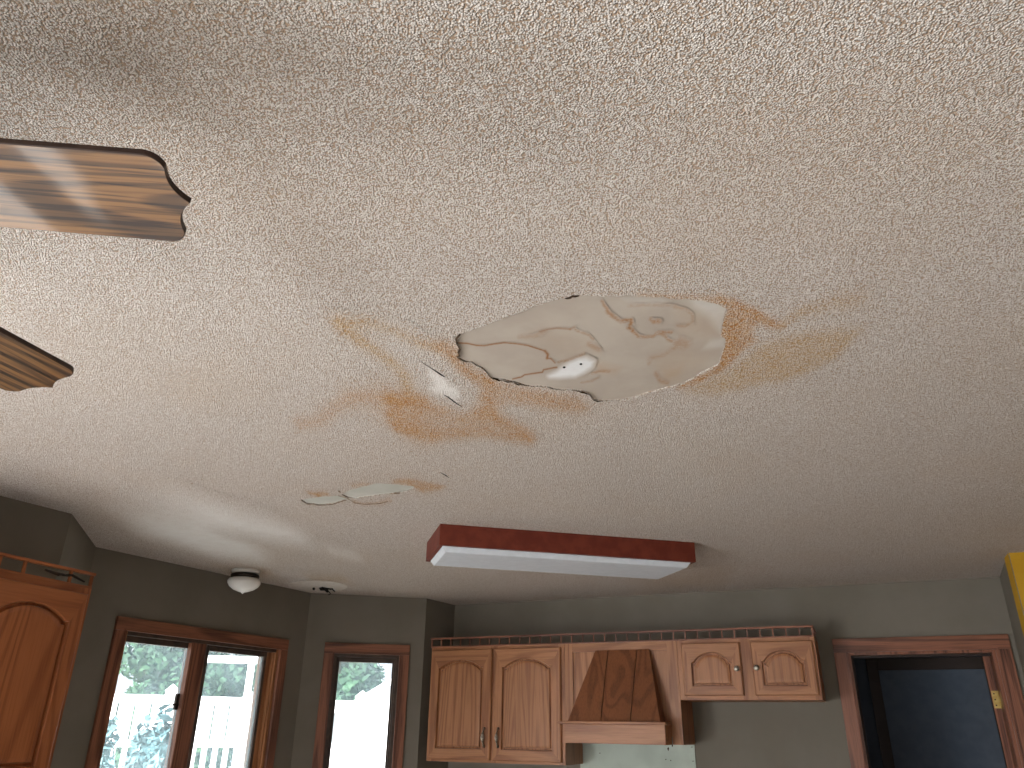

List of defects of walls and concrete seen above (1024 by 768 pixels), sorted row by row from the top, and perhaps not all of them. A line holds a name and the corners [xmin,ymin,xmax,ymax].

water stain [285,307,596,456]
water stain [633,283,879,400]
peeling [301,483,414,506]